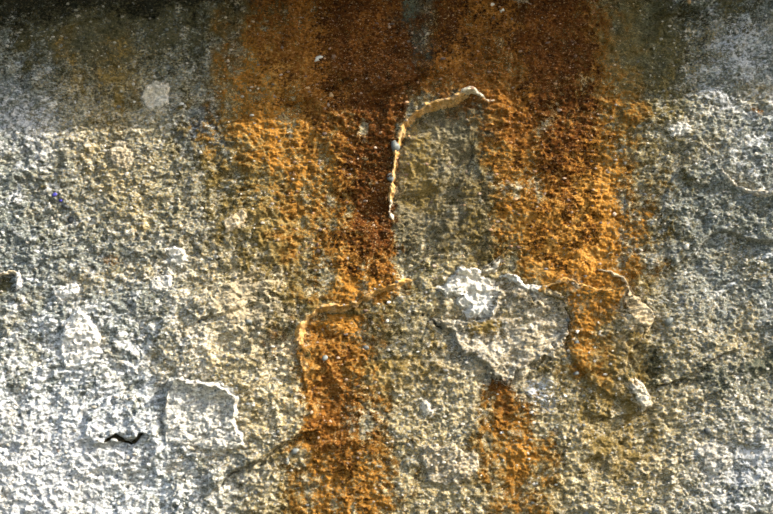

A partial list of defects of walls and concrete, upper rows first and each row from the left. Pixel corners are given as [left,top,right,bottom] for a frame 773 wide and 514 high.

crack [104,433,143,445]
rust [167,0,709,514]
peeling [388,86,569,393]
peeling [630,383,651,411]